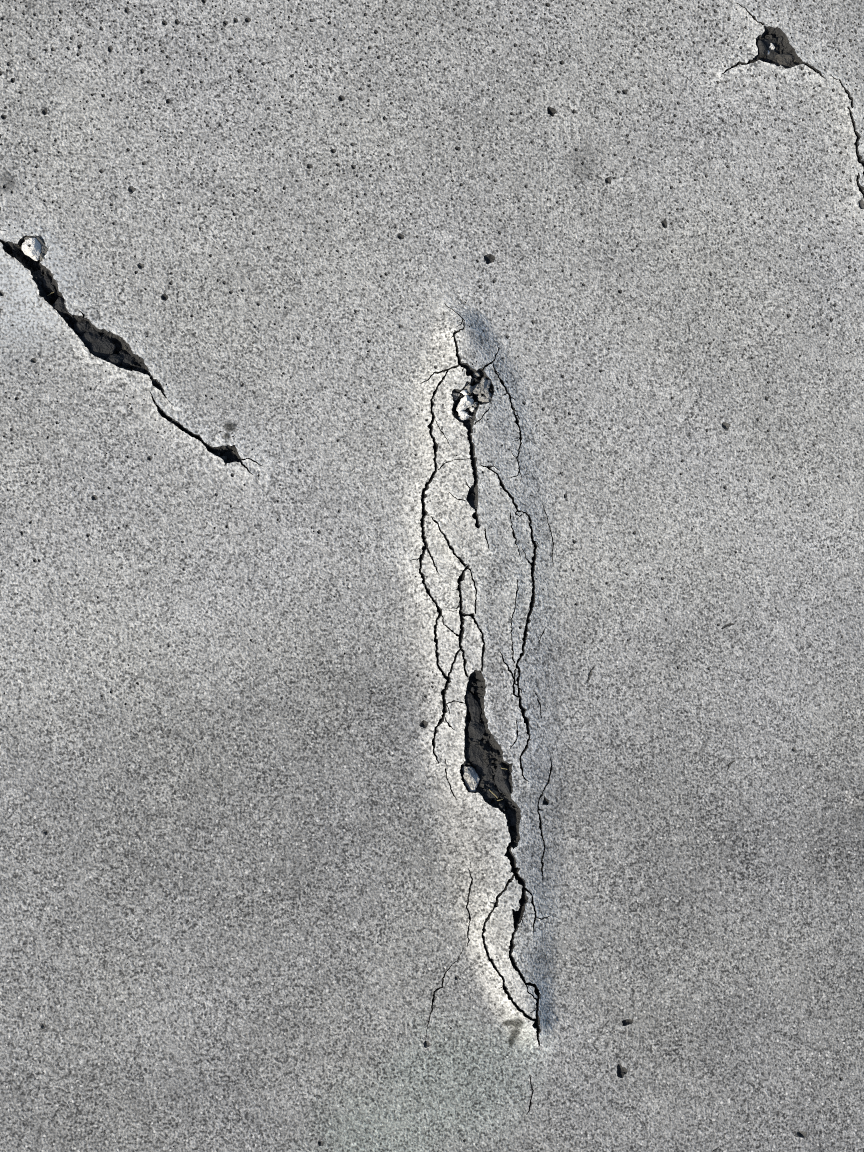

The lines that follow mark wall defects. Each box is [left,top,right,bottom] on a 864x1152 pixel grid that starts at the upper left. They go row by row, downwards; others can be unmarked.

crack [831,75,864,209]
crack [149,390,262,475]
crack [412,303,554,1046]
spalling [460,670,521,849]
crack [526,1077,534,1114]